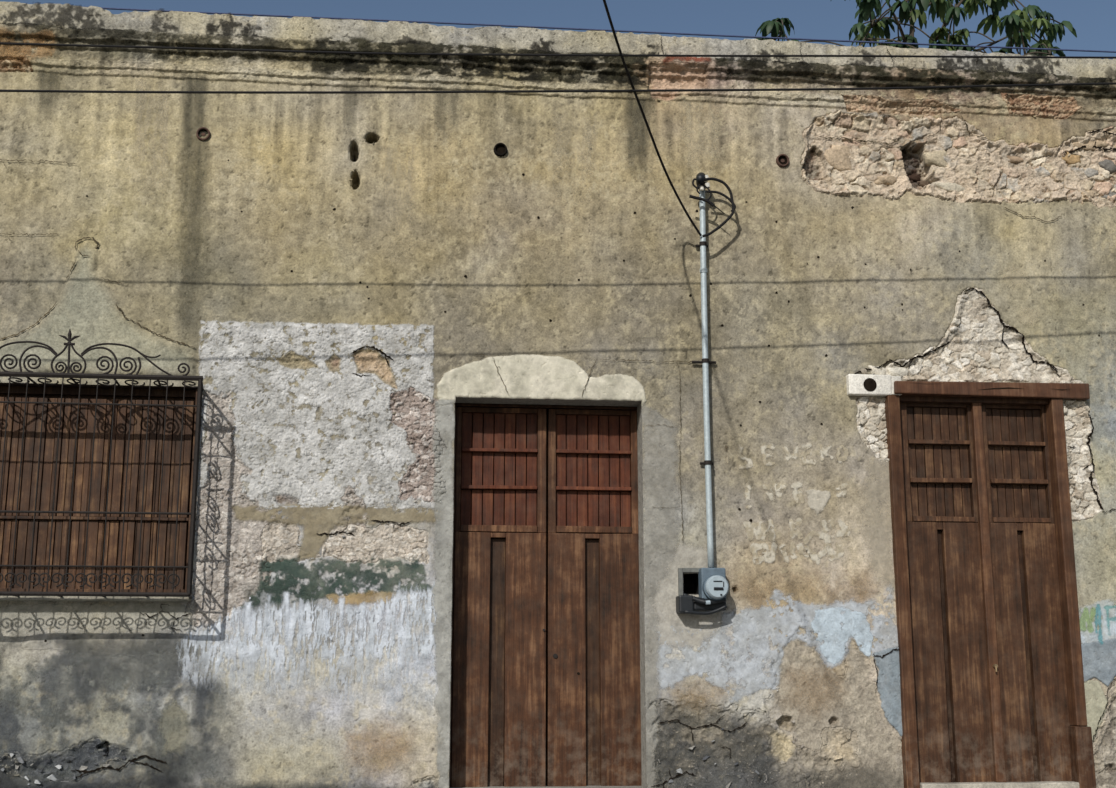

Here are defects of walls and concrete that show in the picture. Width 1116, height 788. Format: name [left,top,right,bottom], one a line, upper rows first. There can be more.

flaking render [801,110,1116,209]
flaking render [880,286,1083,383]
peeling [185,390,429,628]
peeling [274,347,438,503]
flaking render [855,396,889,462]
flaking render [1063,400,1104,521]
crack [1068,414,1116,513]
flaking render [0,738,135,787]
damp [0,651,222,788]
peeling [652,627,904,788]
flaking render [1093,678,1116,788]